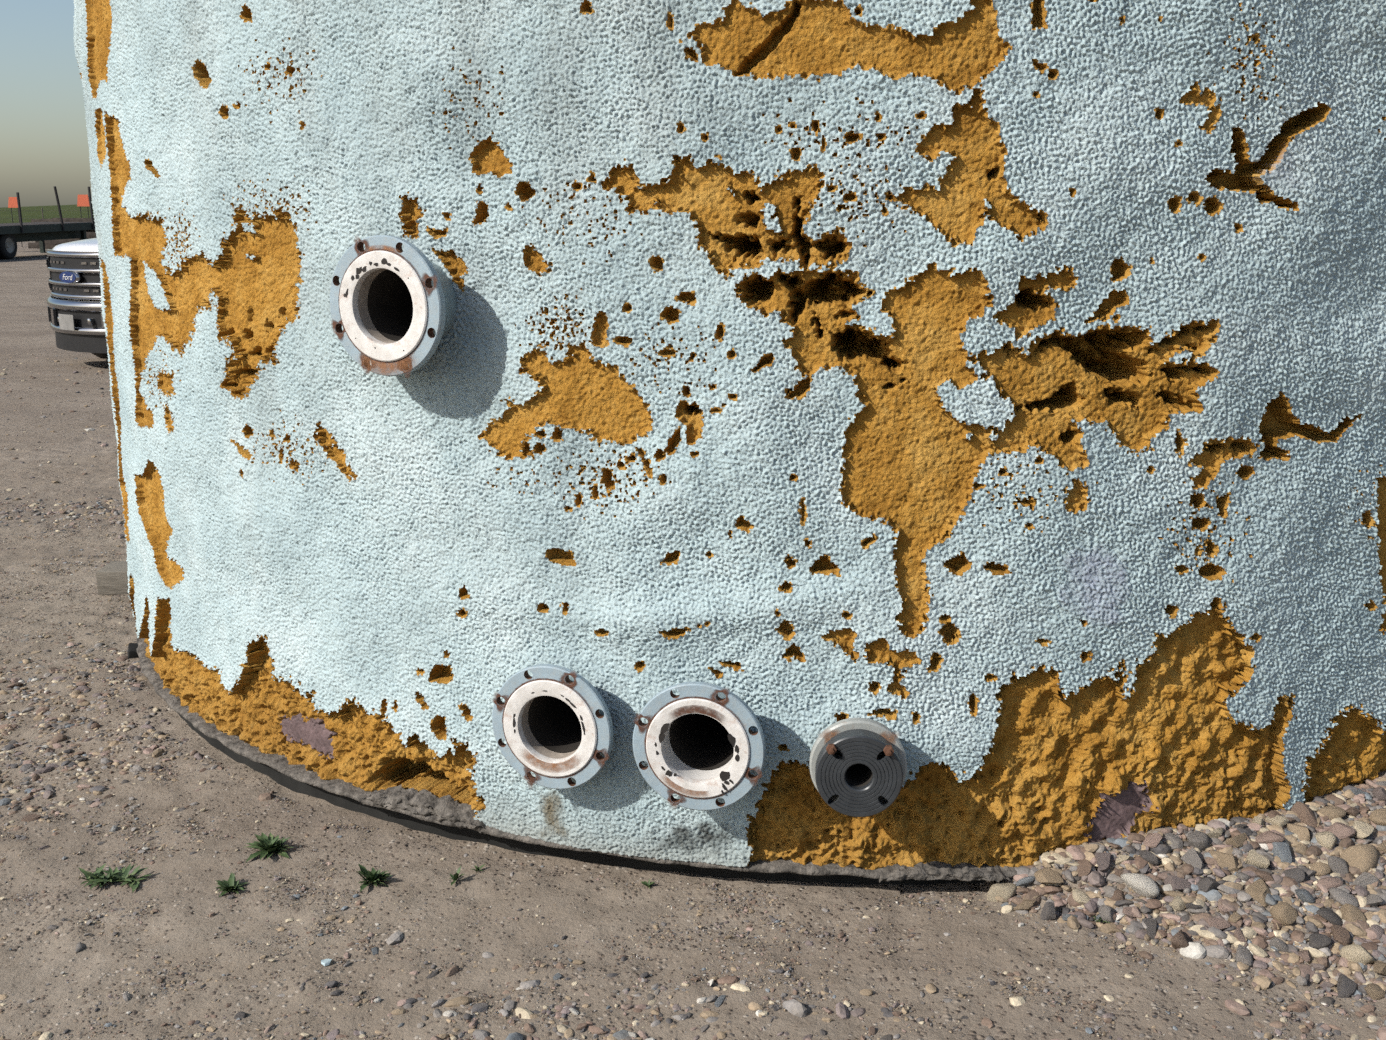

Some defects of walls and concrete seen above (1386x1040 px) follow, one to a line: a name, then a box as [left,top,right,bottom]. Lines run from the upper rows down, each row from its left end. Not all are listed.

peeling [77,0,486,820]
peeling [432,0,1386,870]